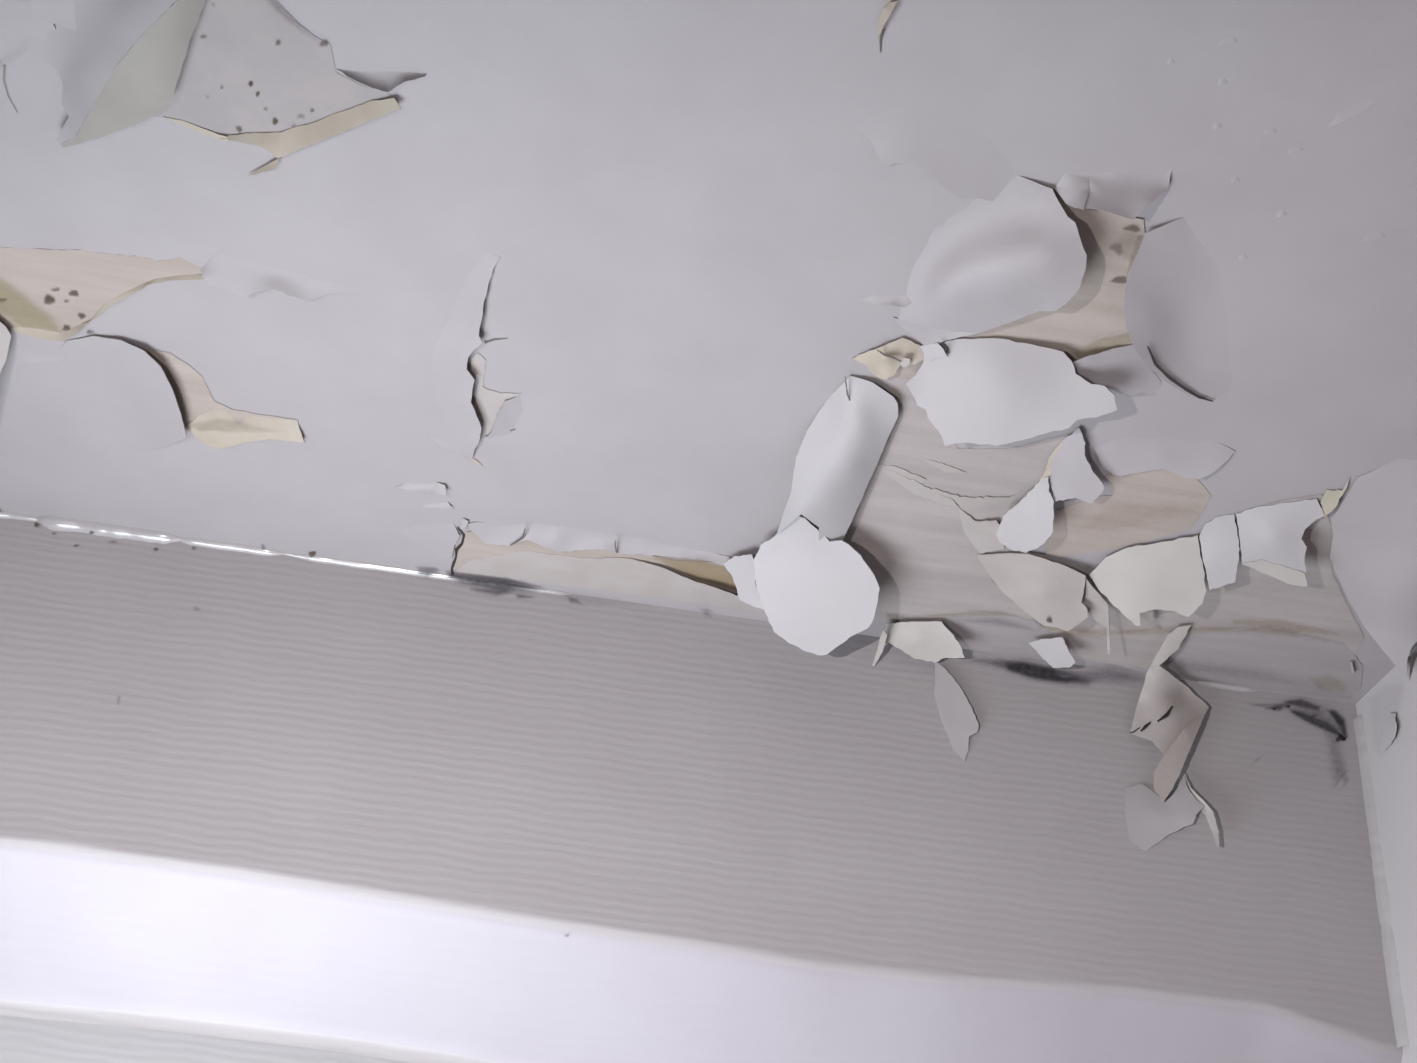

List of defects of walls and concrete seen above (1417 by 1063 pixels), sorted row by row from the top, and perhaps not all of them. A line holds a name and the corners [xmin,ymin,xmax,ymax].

peeling [0,0,427,176]
peeling [877,0,900,53]
peeling [0,224,361,450]
crack [428,253,523,467]
peeling [396,170,1364,851]
damp [1273,700,1346,741]